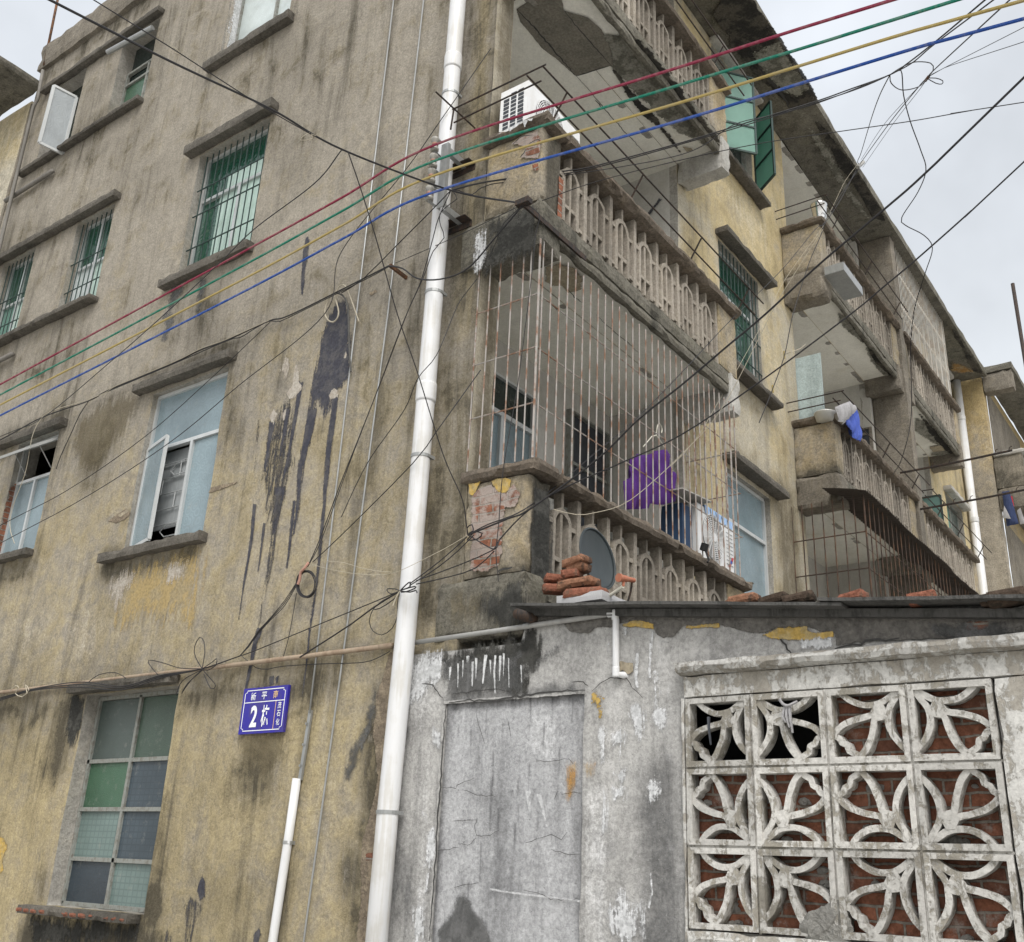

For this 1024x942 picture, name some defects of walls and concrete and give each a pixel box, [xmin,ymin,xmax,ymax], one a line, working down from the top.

peeling [612,70,692,153]
peeling [634,39,722,143]
spalling [468,478,520,572]
water stain [409,486,559,705]
peeling [538,617,1024,650]
crack [422,677,643,940]
water stain [438,897,490,942]